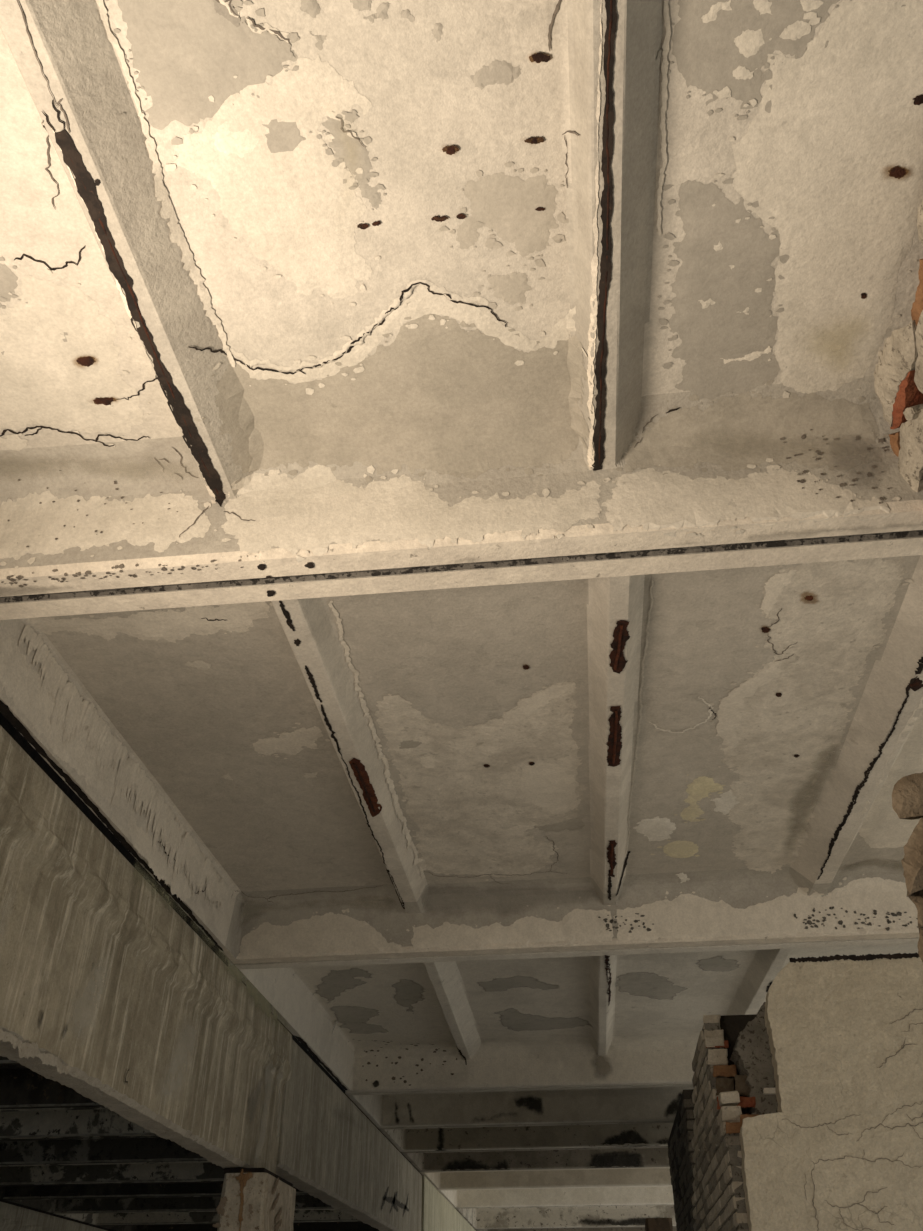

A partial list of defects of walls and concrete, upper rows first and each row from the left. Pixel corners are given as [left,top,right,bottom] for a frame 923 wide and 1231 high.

rust [529,53,551,63]
rust [442,145,459,155]
rust [431,214,466,222]
peeling [42,0,923,507]
peeling [0,257,28,309]
crack [189,279,507,374]
rust [76,356,96,367]
crack [116,377,159,400]
crack [0,426,198,480]
peeling [503,682,577,723]
peeling [519,762,581,818]
crack [817,657,923,880]